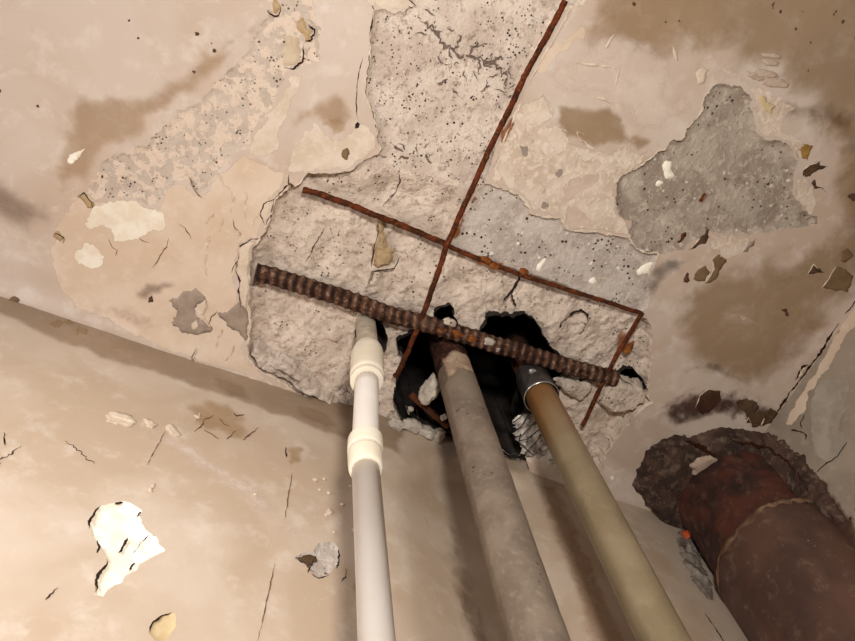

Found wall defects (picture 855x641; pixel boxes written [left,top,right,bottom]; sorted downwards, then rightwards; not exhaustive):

damp [562,110,620,138]
crack [232,176,289,310]
spalling [50,0,828,478]
rust [477,256,502,270]
crack [772,301,855,420]
damp [668,395,778,428]
spalling [88,501,164,596]
spalling [295,541,347,581]